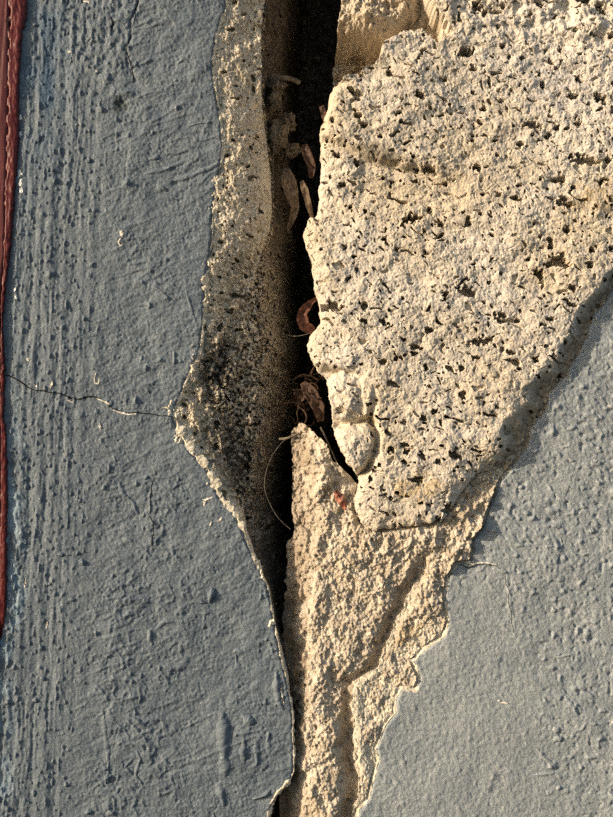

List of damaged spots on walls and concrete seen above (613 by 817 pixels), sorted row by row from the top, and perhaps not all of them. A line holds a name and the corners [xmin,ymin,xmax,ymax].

crack [8,0,355,737]
crack [270,795,280,817]
spalling [163,0,613,817]
crack [452,562,514,633]